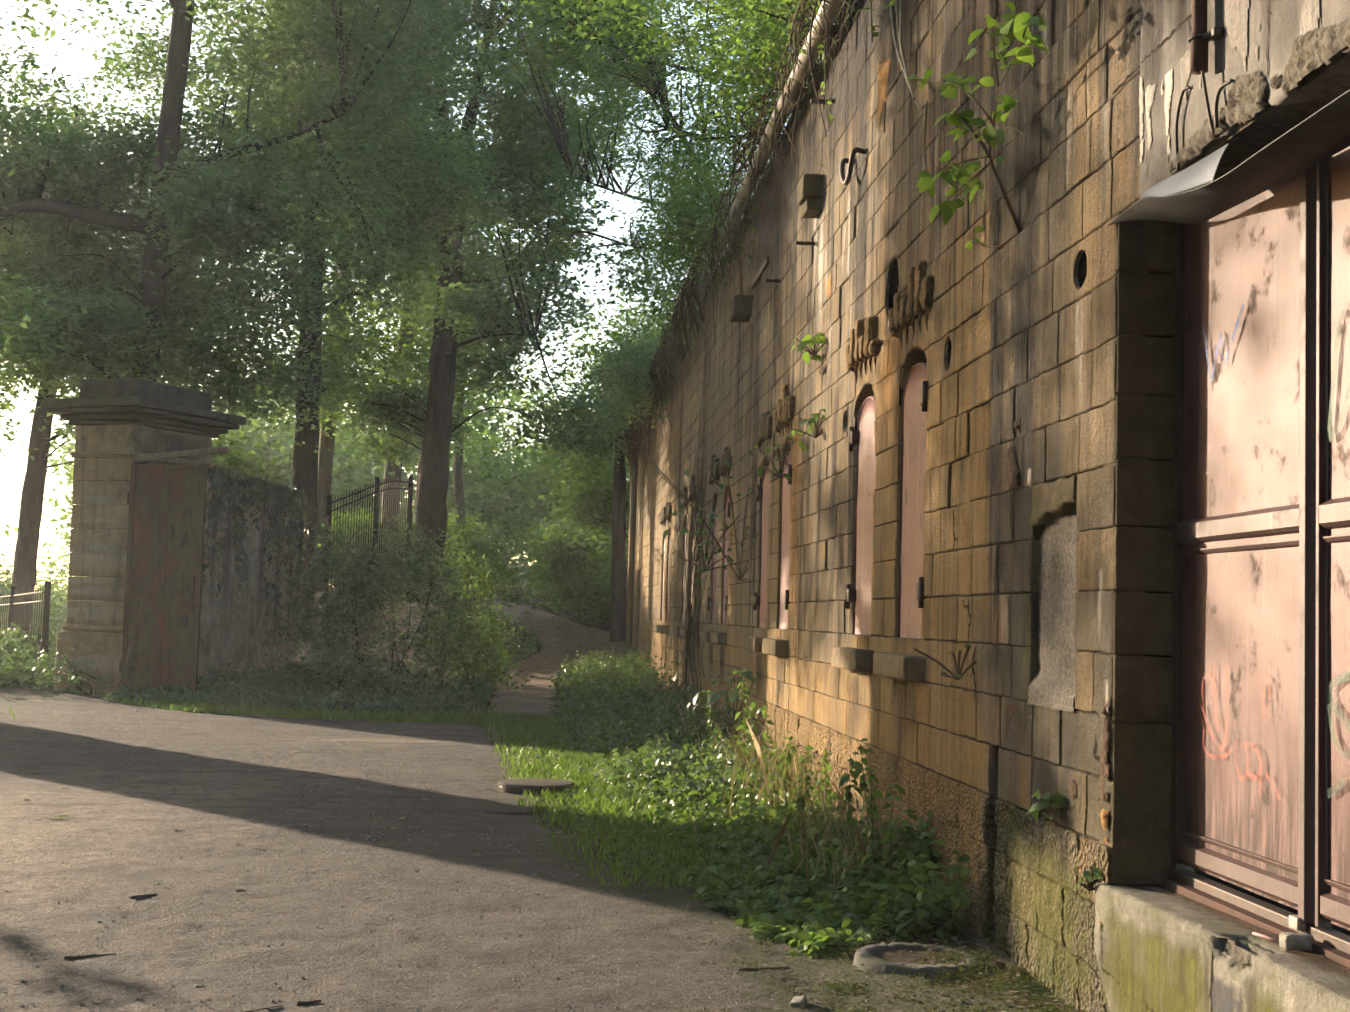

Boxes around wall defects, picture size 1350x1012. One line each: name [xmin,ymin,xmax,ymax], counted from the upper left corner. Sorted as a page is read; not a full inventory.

leakage [1105,918,1184,1012]